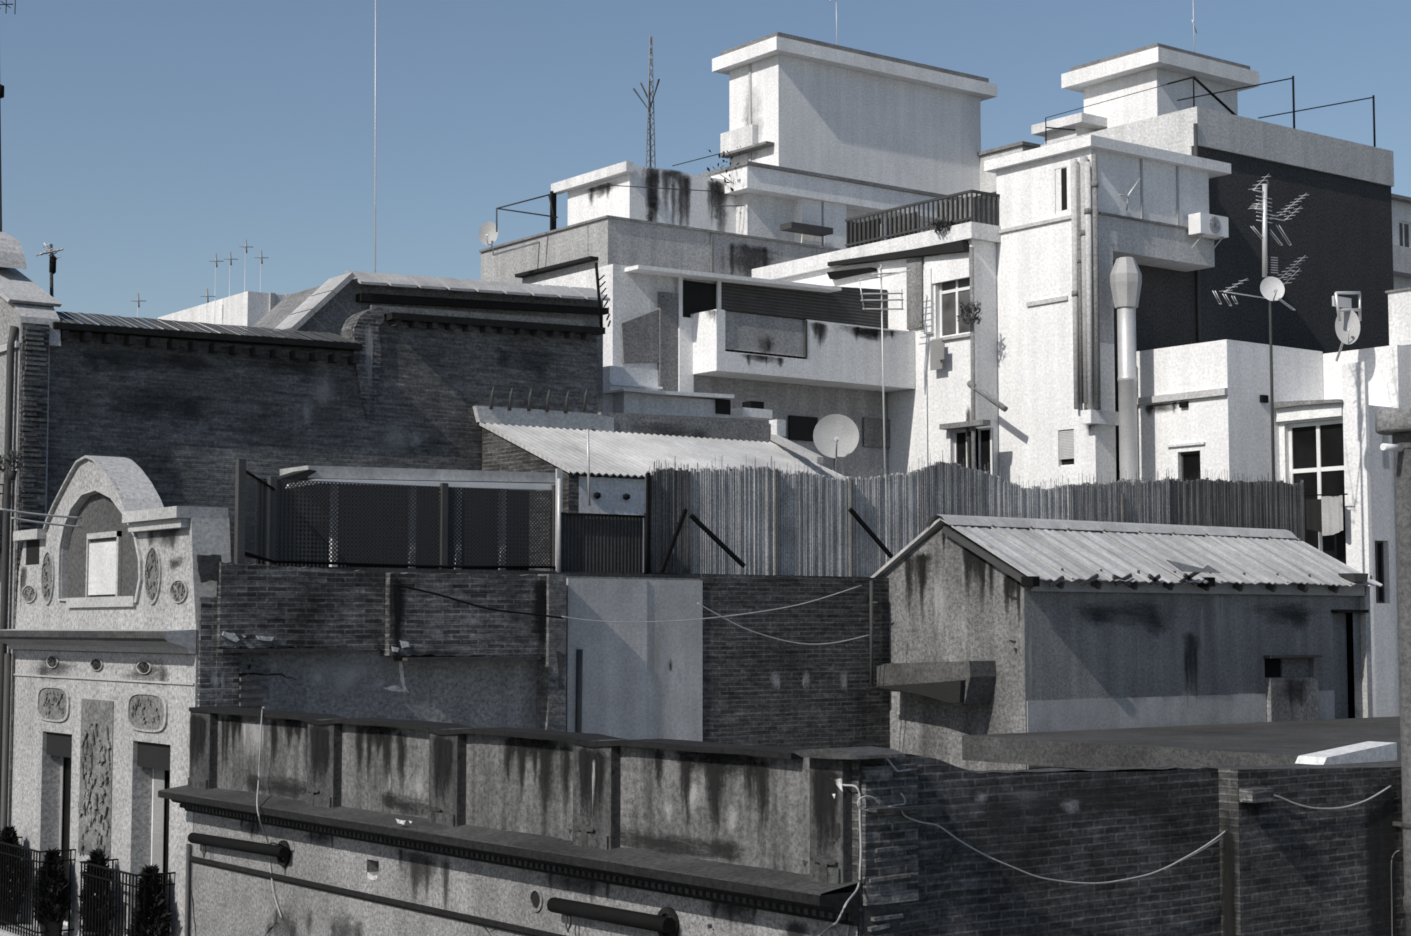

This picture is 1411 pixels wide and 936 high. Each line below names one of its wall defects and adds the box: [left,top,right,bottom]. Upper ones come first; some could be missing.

leakage [645,168,690,226]
leakage [708,182,725,231]
leakage [730,244,771,277]
leakage [904,532,946,620]
leakage [963,544,1020,616]
leakage [356,726,452,815]
leakage [504,737,605,812]
leakage [620,749,769,860]
leakage [812,768,837,840]